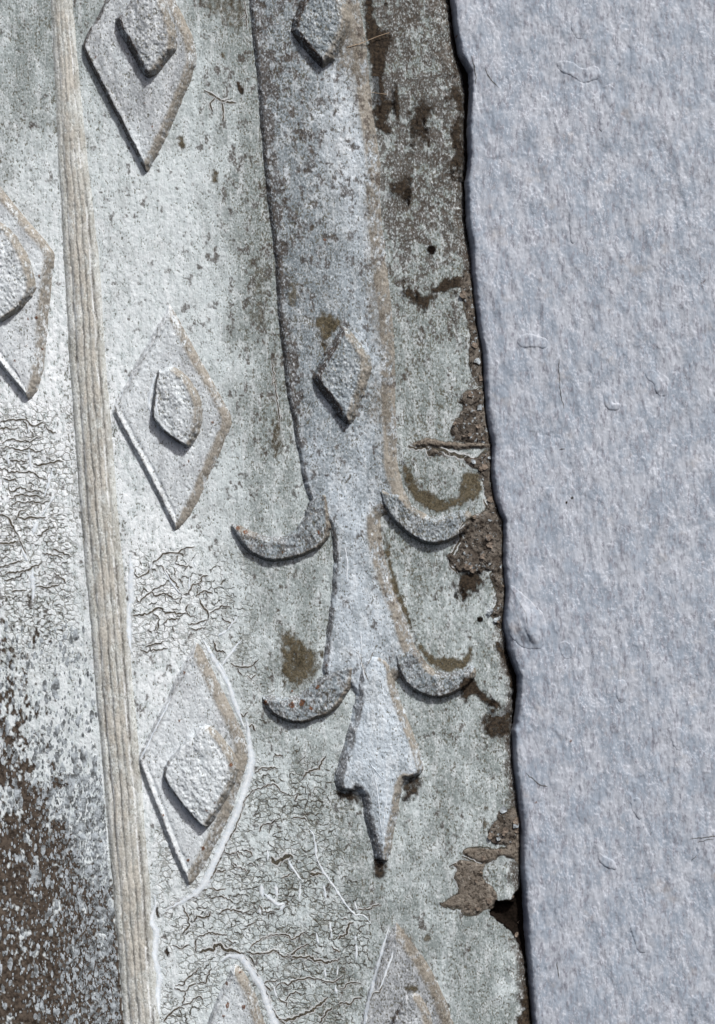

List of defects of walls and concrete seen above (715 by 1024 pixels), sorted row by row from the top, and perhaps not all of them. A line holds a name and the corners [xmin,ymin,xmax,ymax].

water stain [361,0,400,135]
water stain [402,270,466,313]
spalling [412,271,505,628]
crack [0,414,72,641]
crack [133,546,259,680]
crack [240,712,265,731]
crack [163,748,389,1024]
spalling [439,806,525,957]